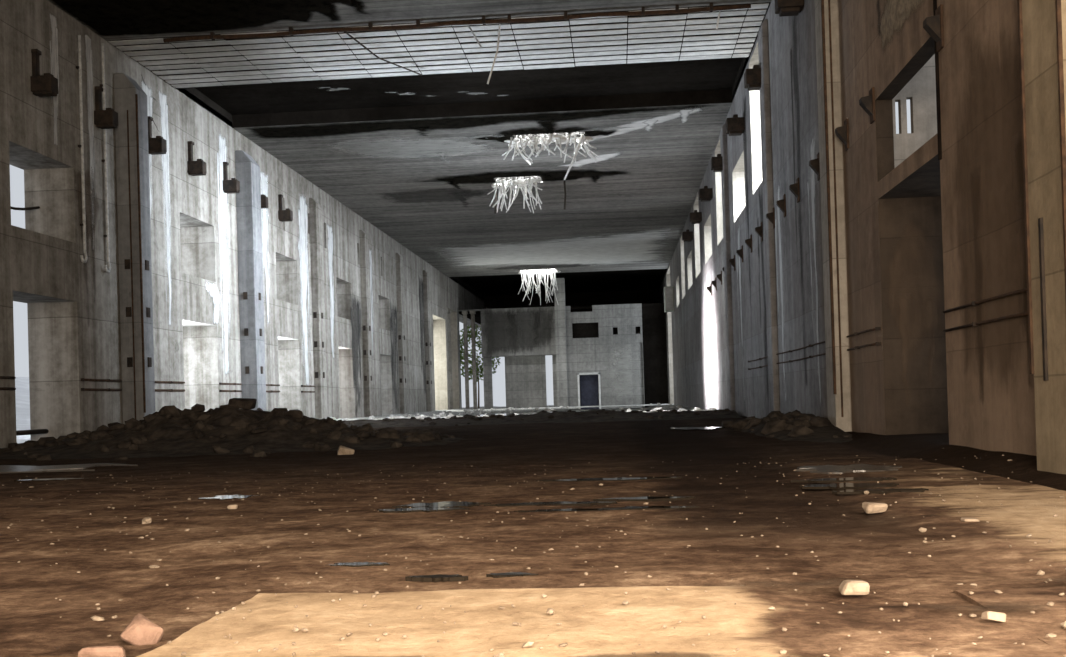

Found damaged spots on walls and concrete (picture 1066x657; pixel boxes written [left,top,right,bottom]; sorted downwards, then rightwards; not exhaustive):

leakage [50,0,367,249]
spalling [425,127,627,213]
spalling [495,264,586,305]